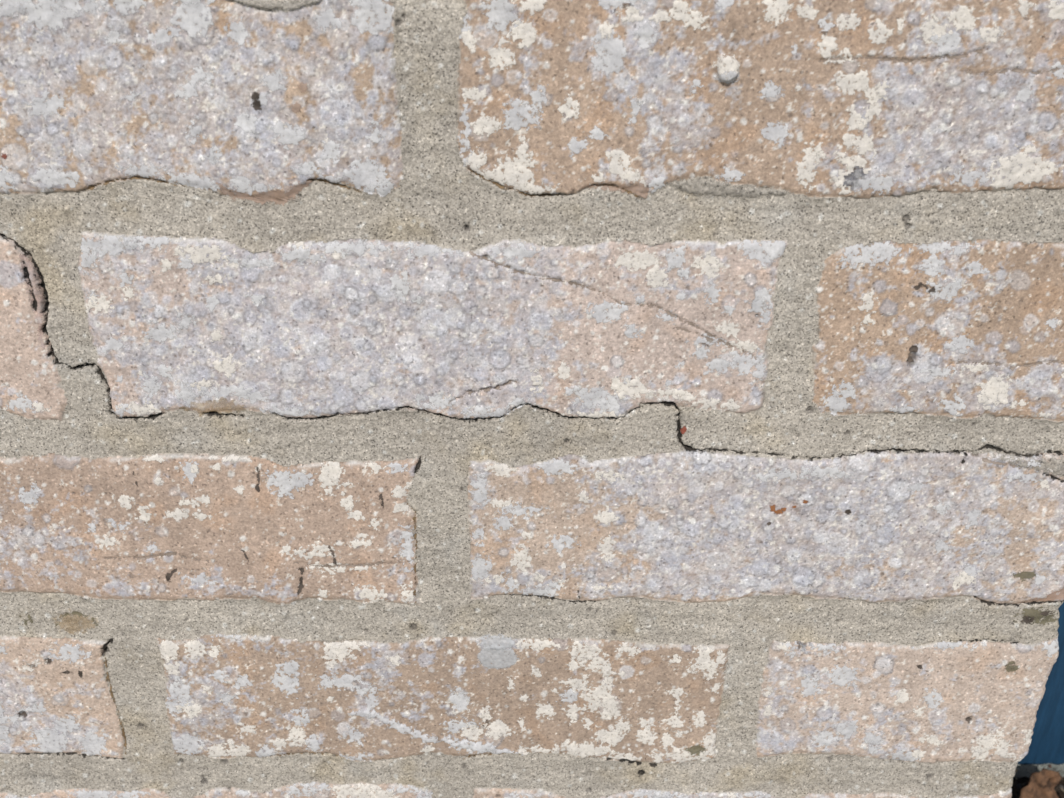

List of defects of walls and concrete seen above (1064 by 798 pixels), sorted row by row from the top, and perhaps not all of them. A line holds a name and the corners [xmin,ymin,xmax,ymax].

water stain [251,92,262,112]
crack [0,234,163,421]
crack [205,410,244,418]
crack [276,401,1064,483]
peeling [87,494,152,550]
peeling [165,454,388,603]
peeling [364,460,414,605]
crack [407,503,418,603]
water stain [1014,607,1059,625]
peeling [0,699,112,756]
water stain [607,758,657,777]
water stain [685,745,706,756]